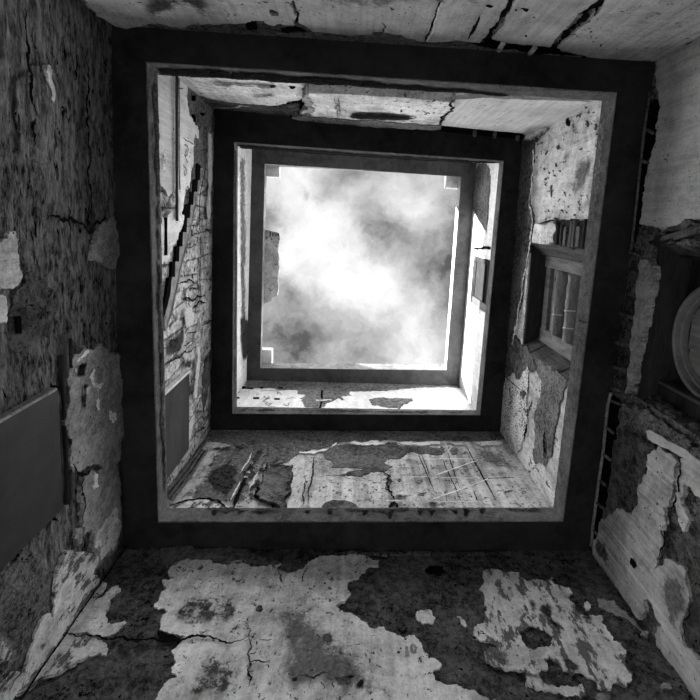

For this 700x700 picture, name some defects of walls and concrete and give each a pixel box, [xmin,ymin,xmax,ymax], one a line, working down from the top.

crack [425,2,443,42]
crack [468,17,480,39]
crack [46,51,108,234]
spalling [82,10,120,269]
peeling [0,231,23,323]
crack [167,320,213,364]
crack [179,279,207,308]
spalling [206,126,569,508]
peeling [0,316,700,700]
crack [658,457,681,557]
crack [20,545,271,700]
crack [682,602,691,640]